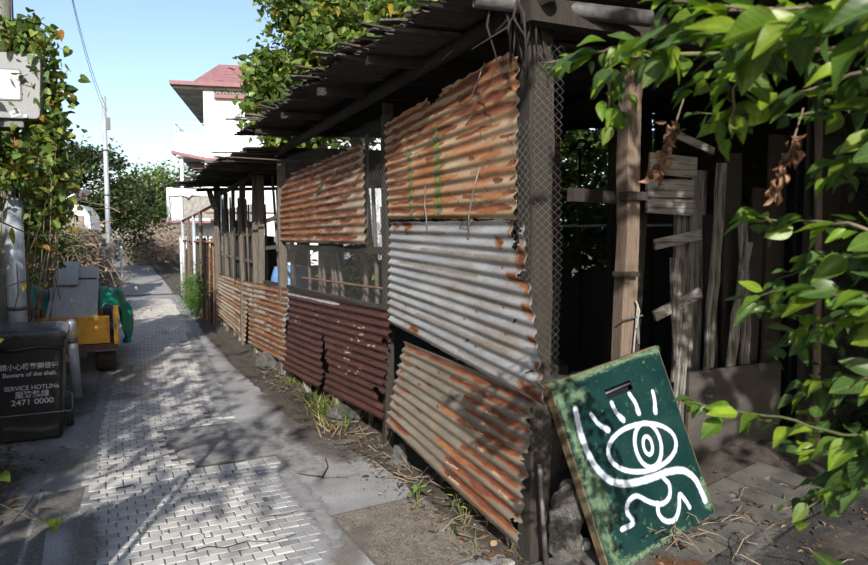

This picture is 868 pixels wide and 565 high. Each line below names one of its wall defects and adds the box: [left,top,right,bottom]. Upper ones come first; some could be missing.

rust [280,156,361,244]
rust [385,57,519,266]
rust [495,221,534,317]
rust [217,274,388,394]
crack [298,458,356,478]
rust [388,345,544,538]